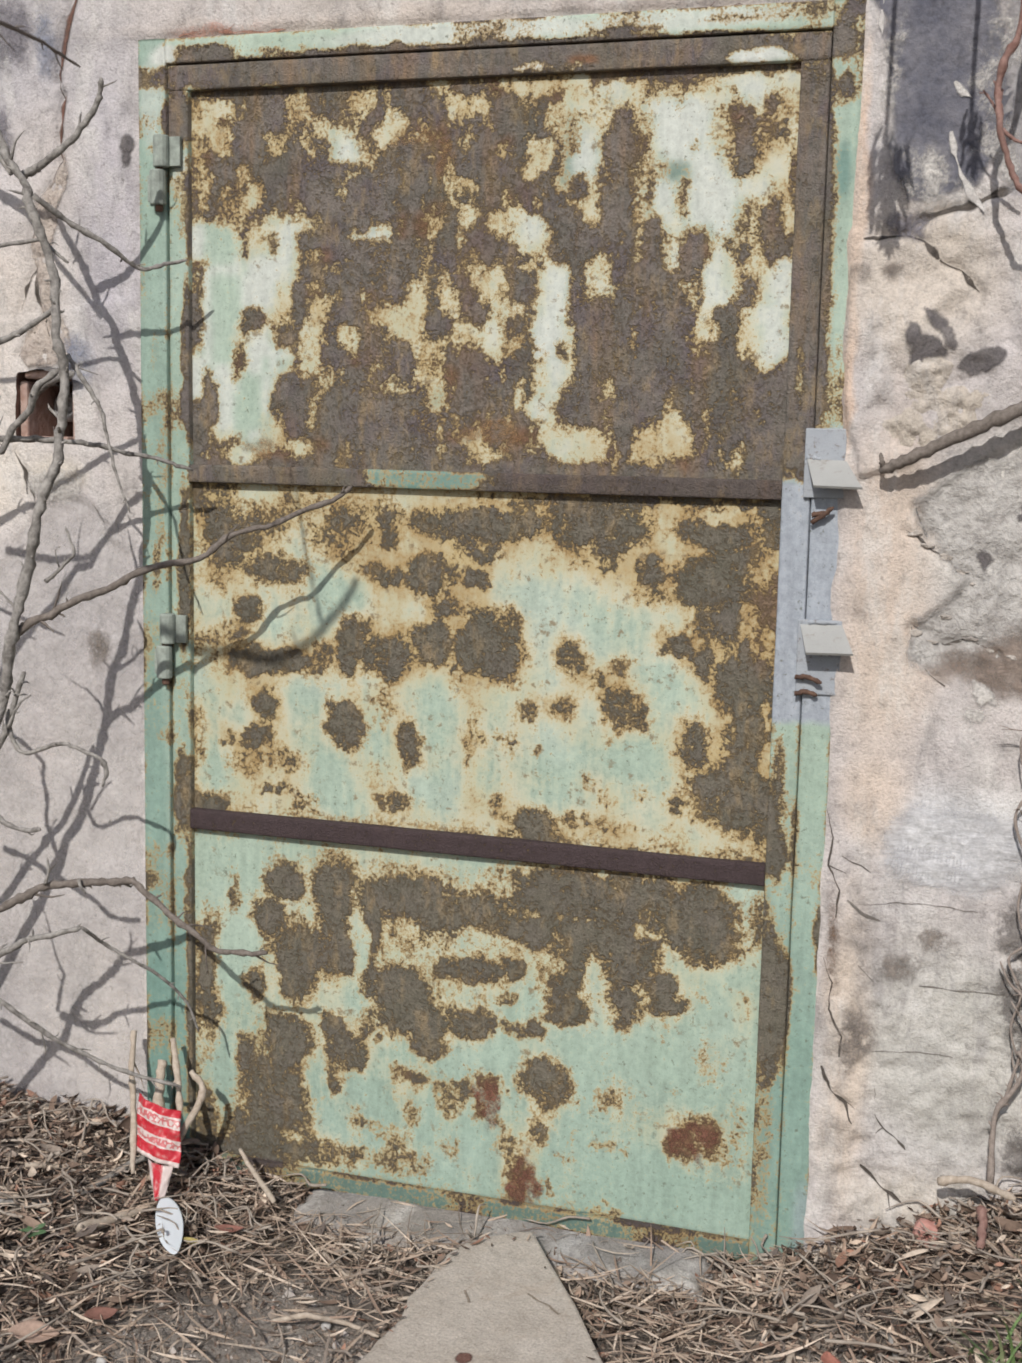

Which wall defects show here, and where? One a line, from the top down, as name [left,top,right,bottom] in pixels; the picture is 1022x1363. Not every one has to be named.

leakage [954,81,972,98]
leakage [922,131,985,212]
crack [864,186,1014,291]
crack [820,958,953,1150]
corrosion [472,1082,500,1125]
corrosion [667,1123,719,1163]
corrosion [505,1158,543,1201]
crack [860,1164,901,1207]